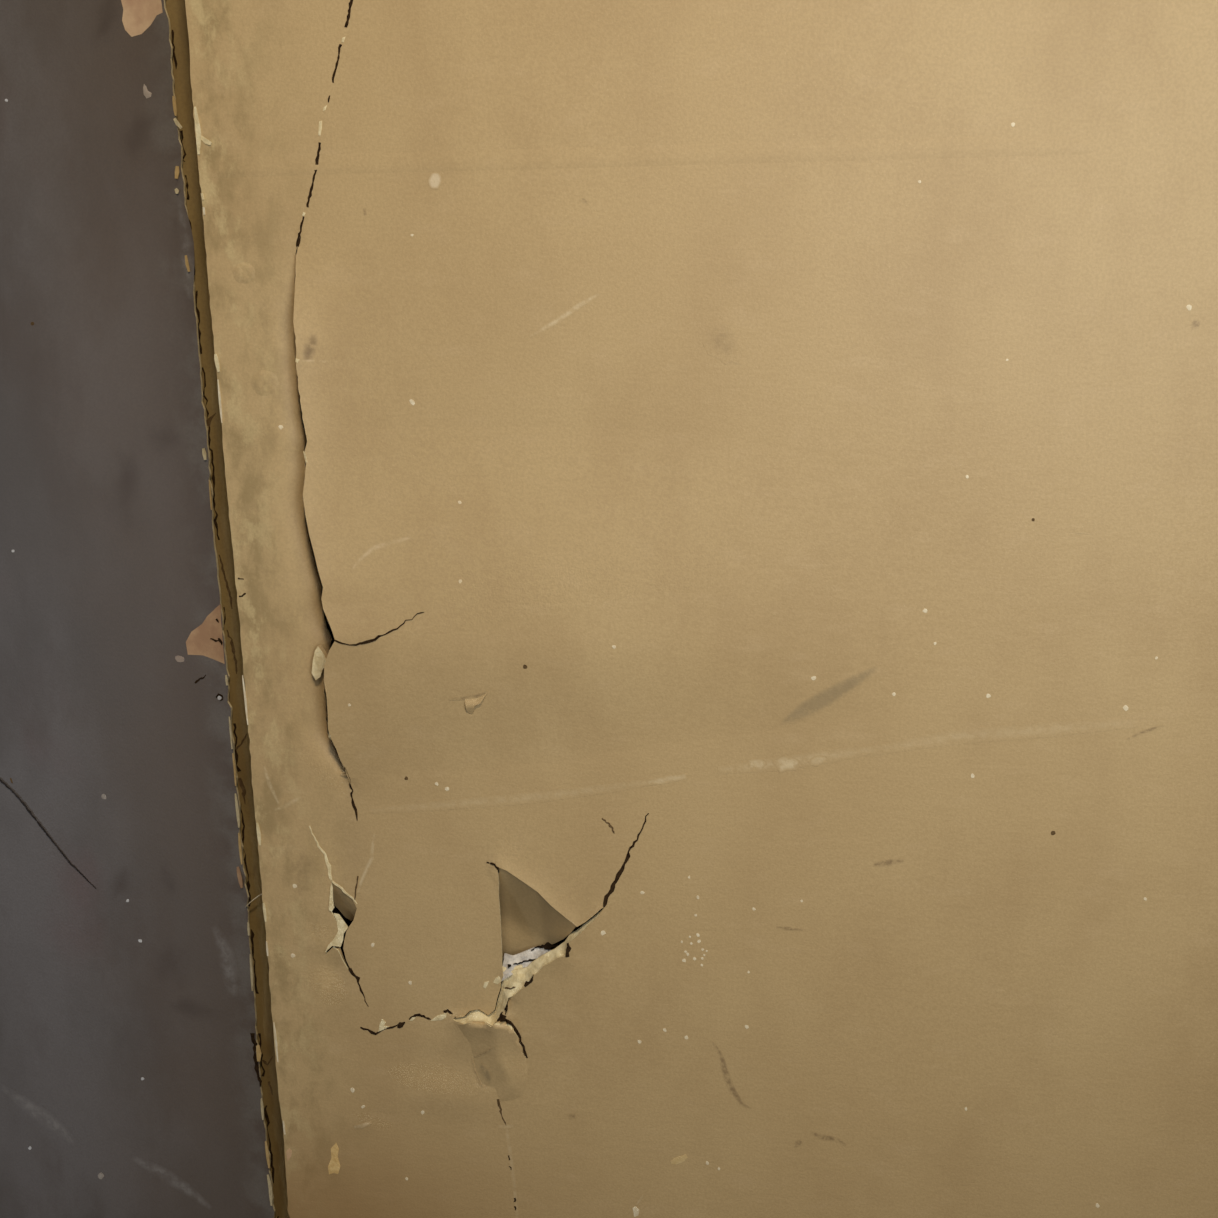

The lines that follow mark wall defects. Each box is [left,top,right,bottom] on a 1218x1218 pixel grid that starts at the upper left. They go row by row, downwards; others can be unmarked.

peeling [121,0,163,37]
crack [296,0,353,247]
peeling [175,604,248,725]
crack [305,516,424,739]
crack [0,778,96,889]
crack [345,768,358,821]
crack [497,1099,519,1218]